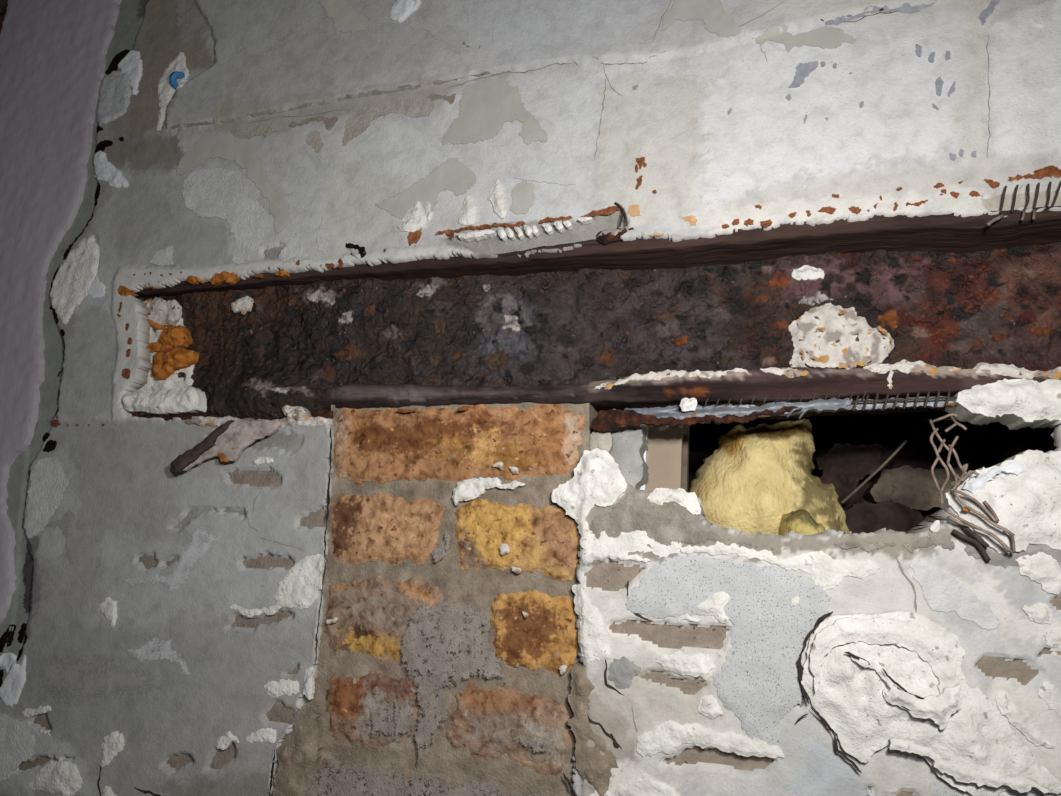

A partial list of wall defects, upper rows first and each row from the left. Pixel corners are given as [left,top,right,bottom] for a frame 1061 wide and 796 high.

peeling [289,76,548,152]
crack [166,0,672,160]
peeling [755,0,937,100]
rust [933,165,1061,198]
rust [435,221,525,239]
rust [539,204,682,246]
rust [145,314,199,380]
rust [132,412,220,421]
spalling [688,411,1057,534]
peeling [0,652,26,707]
crack [796,611,862,774]
crack [844,652,936,724]